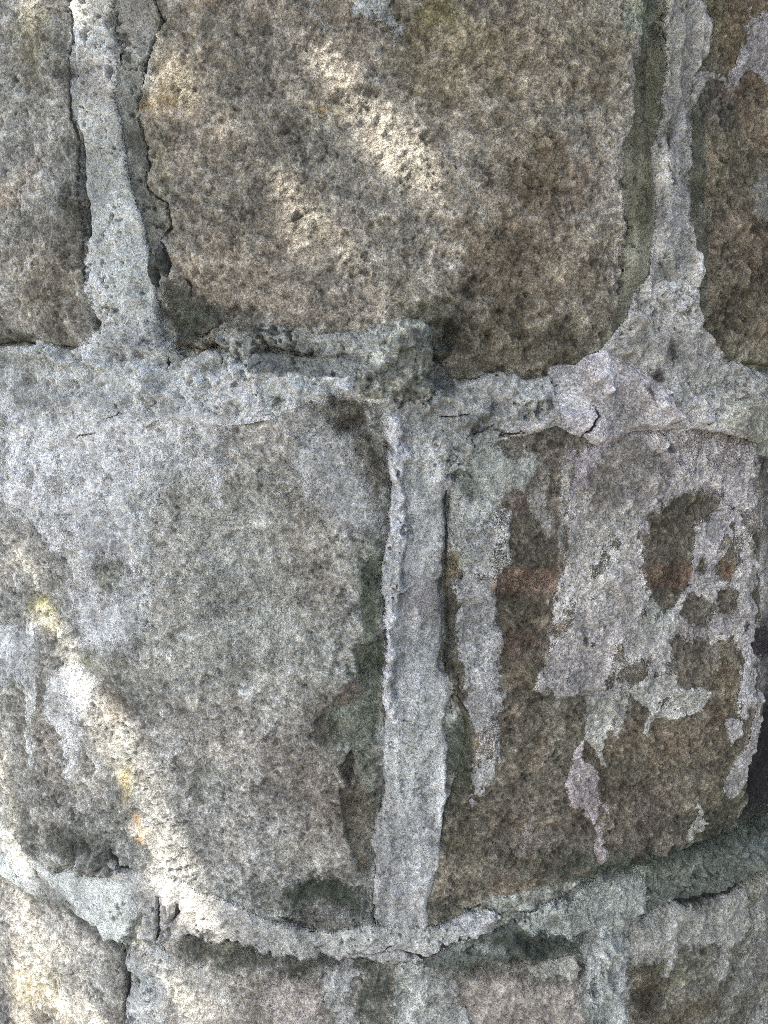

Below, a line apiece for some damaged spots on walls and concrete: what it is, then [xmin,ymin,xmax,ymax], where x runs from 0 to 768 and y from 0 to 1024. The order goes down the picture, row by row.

crack [138,4,193,293]
crack [441,414,524,436]
crack [582,410,600,435]